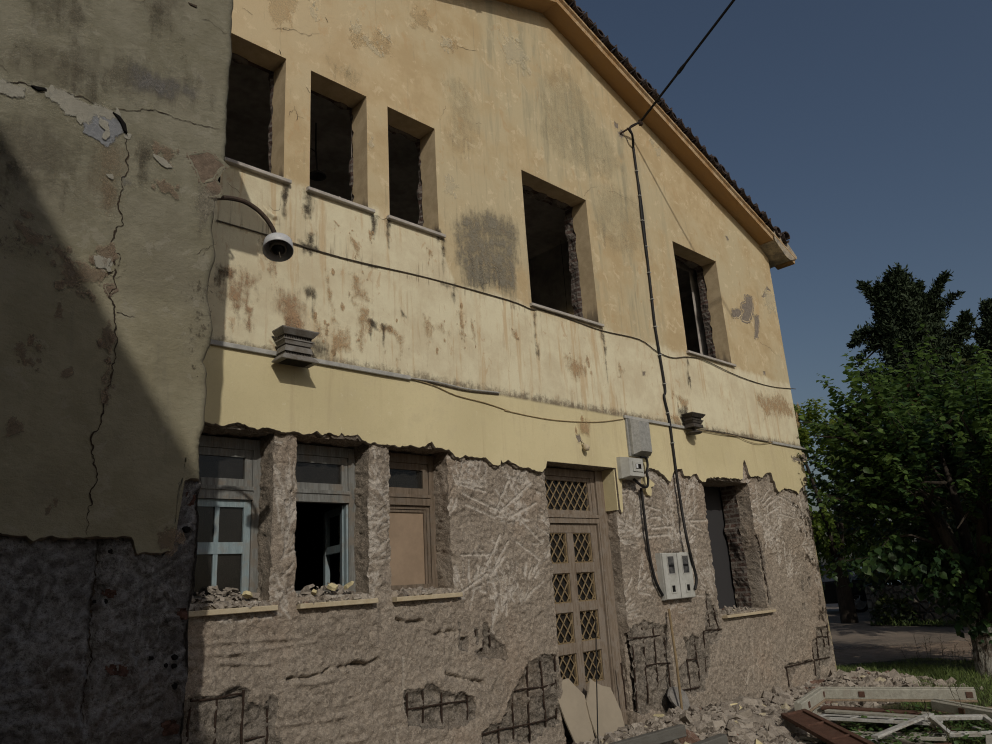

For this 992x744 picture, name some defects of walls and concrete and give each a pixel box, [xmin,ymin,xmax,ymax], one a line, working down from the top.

peeling [44,85,131,147]
water stain [456,212,516,291]
spalling [730,286,771,340]
crack [81,139,134,724]
spalling [204,422,624,514]
spalling [677,460,807,495]
spalling [458,622,509,661]
spalling [620,592,722,716]
spalling [784,624,833,689]
spalling [182,685,283,744]
spalling [403,683,476,731]
spalling [481,654,561,744]